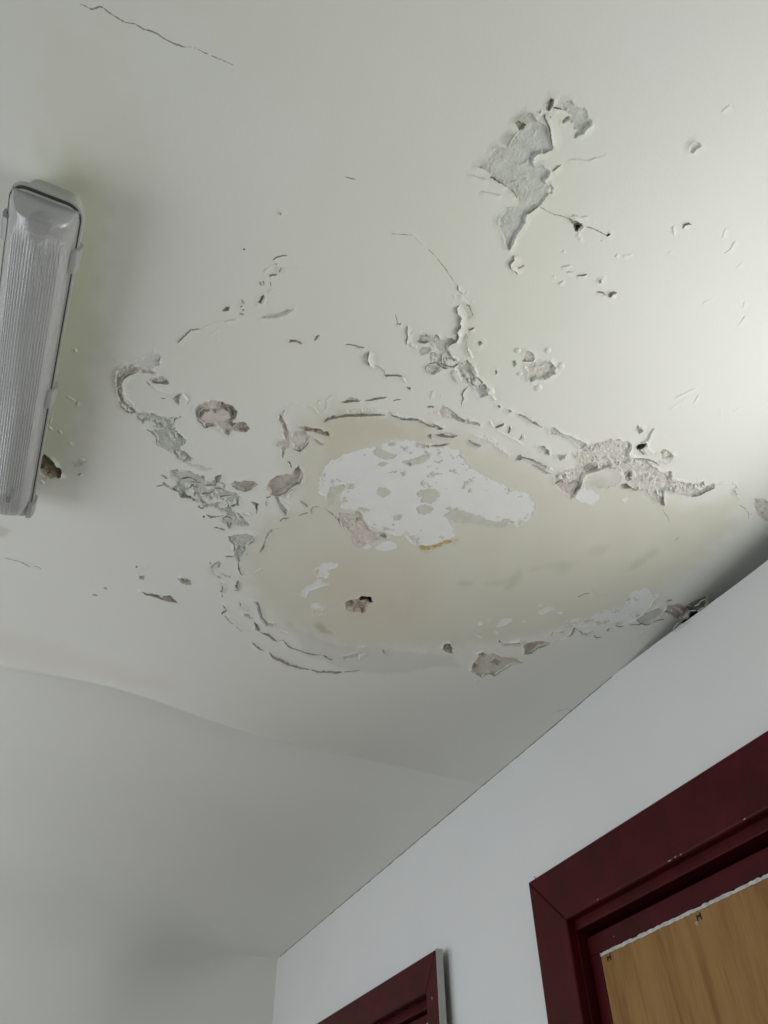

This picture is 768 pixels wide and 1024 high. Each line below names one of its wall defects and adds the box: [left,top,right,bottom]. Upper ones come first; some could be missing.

crack [81,4,233,65]
peeling [467,92,606,275]
crack [541,207,613,242]
spalling [39,452,66,481]
peeling [110,285,768,684]
damp [229,399,752,677]